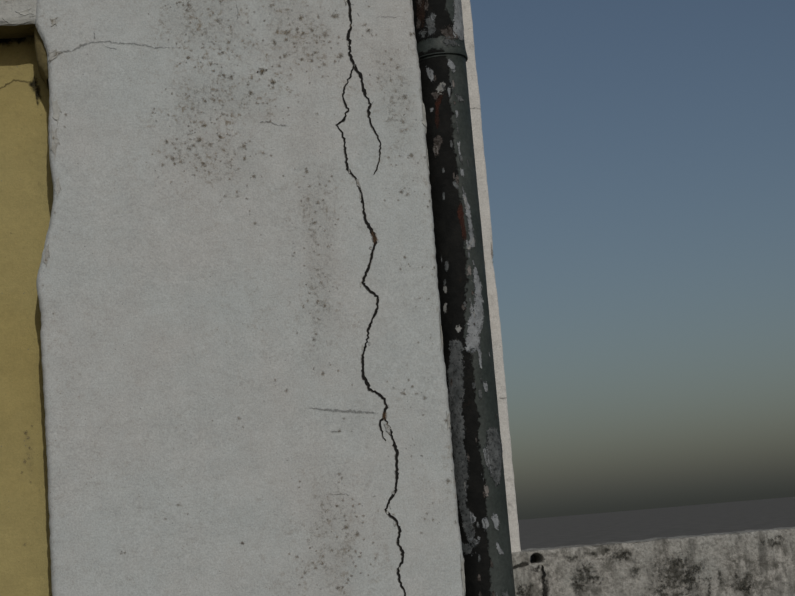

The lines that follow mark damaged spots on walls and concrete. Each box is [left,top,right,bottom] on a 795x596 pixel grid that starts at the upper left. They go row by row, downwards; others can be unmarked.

crack [336,0,406,596]
peeling [410,0,509,596]
damp [573,566,601,591]
damp [649,558,722,596]